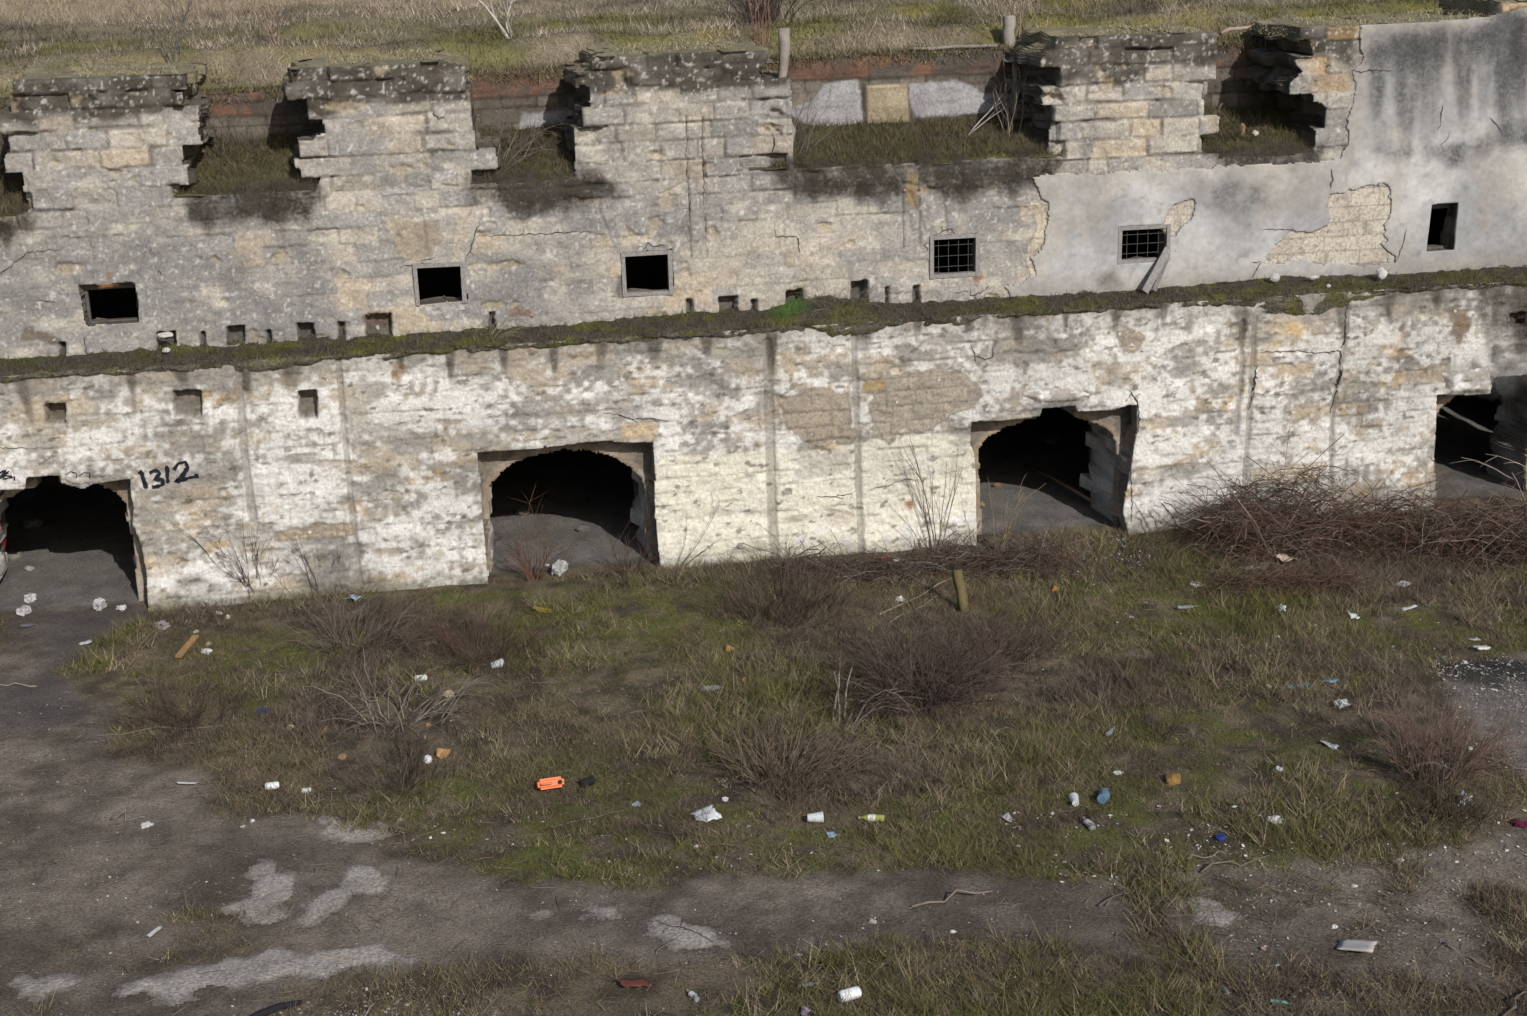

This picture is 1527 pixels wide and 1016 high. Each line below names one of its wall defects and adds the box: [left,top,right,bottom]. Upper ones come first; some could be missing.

water stain [1374,13,1527,113]
water stain [1449,144,1465,165]
peeling [1264,182,1395,265]
crack [1248,306,1348,414]